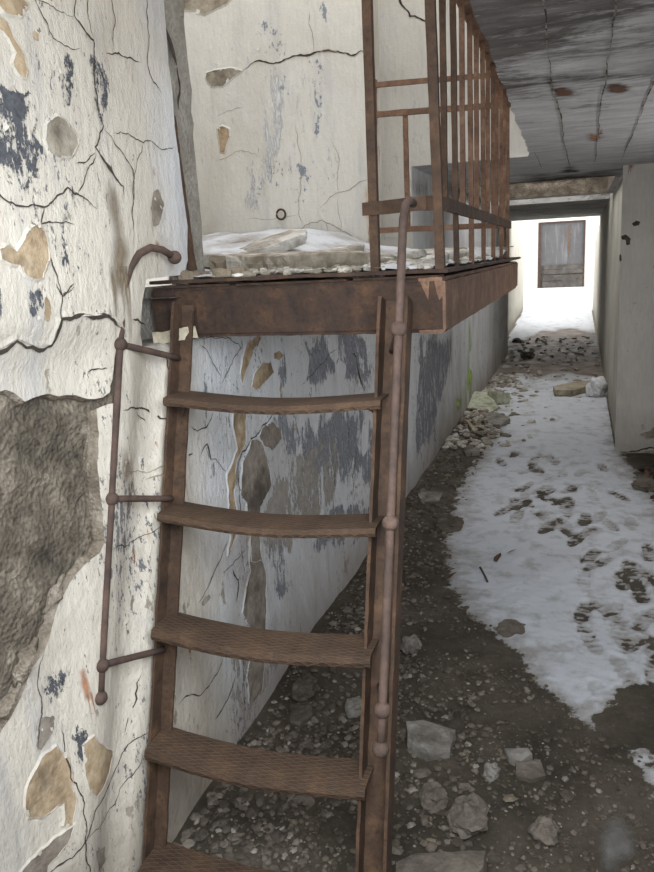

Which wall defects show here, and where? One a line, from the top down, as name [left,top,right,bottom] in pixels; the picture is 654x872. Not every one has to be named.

flaking render [0,0,79,193]
crack [0,0,181,229]
crack [242,13,363,71]
corrosion [554,88,572,96]
corrosion [608,84,628,93]
crack [0,254,146,355]
flaking render [216,336,287,393]
peeling [206,410,372,515]
flaking render [0,352,116,732]
crack [36,655,44,743]
flaking render [18,716,113,872]
crack [51,672,149,872]